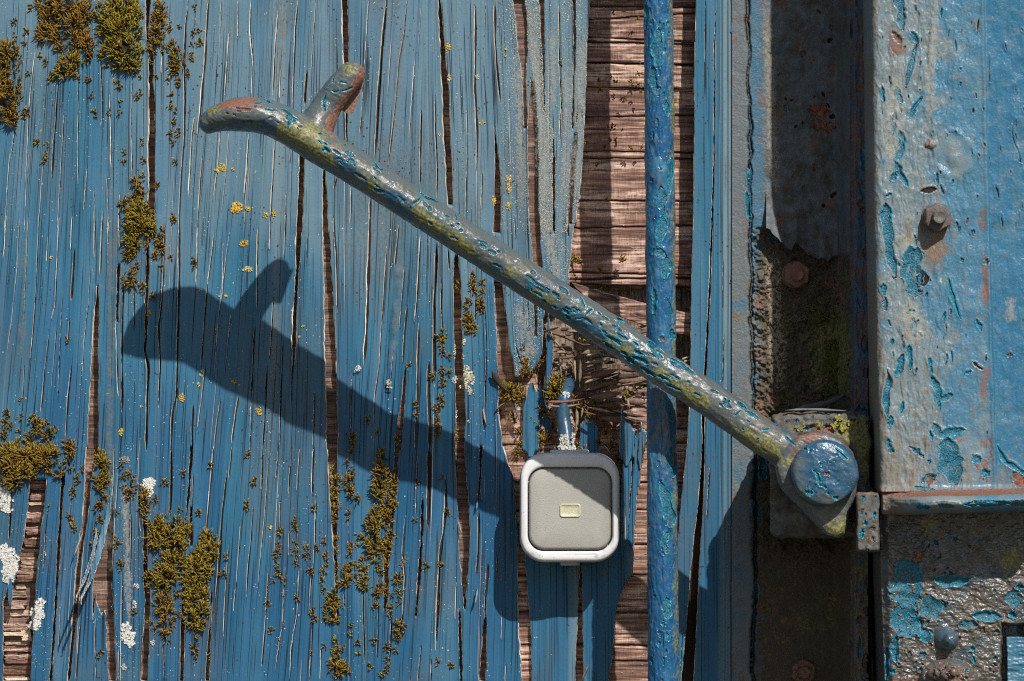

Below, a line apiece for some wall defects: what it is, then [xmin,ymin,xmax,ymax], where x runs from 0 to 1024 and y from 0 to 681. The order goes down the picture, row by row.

crack [2,0,537,679]
peeling [318,132,387,193]
crack [341,0,582,268]
peeling [644,3,671,139]
peeling [650,153,676,341]
peeling [879,0,954,454]
peeling [943,278,962,333]
peeling [885,541,970,681]
peeling [957,584,1024,640]